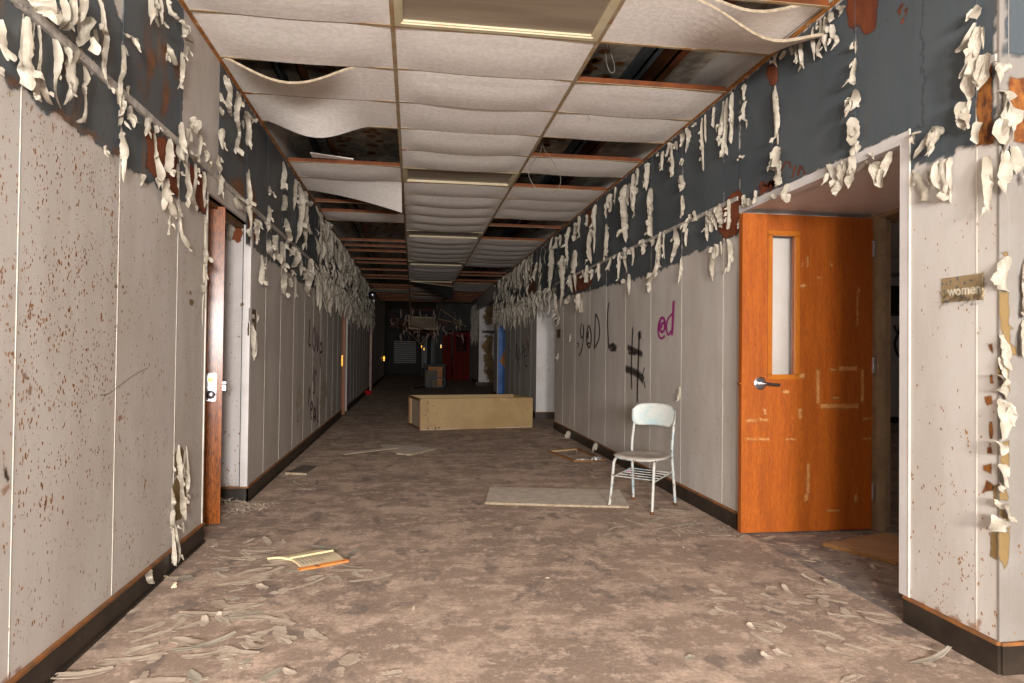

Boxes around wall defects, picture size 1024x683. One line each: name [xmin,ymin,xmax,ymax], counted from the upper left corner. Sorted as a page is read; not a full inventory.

corrosion [846,0,878,34]
peeling [0,0,375,334]
corrosion [718,190,742,238]
peeling [470,0,1024,382]
corrosion [976,65,994,146]
corrosion [1008,77,1024,143]
corrosion [0,91,206,601]
peeling [170,445,191,566]
corrosion [911,374,995,540]
peeling [989,252,1024,568]
corrosion [919,539,997,634]